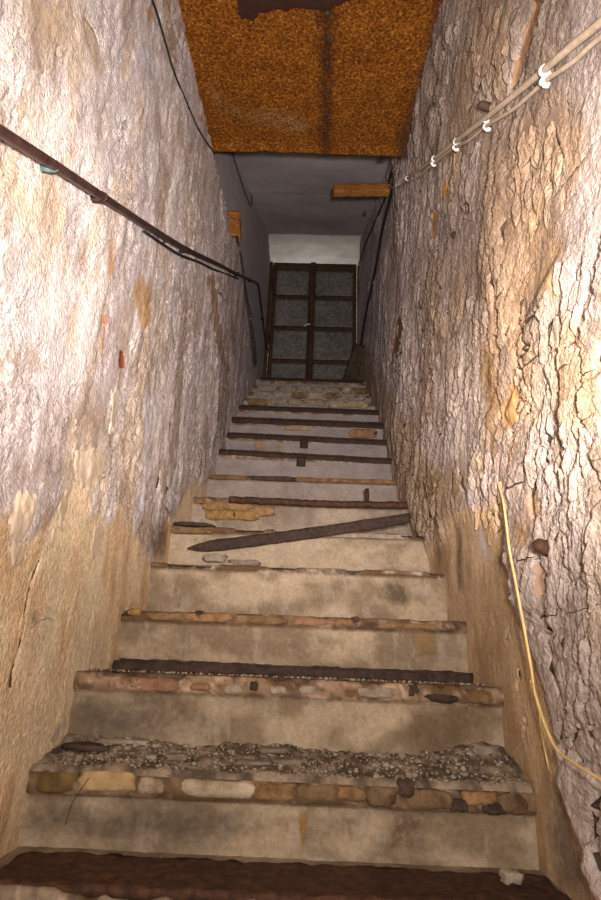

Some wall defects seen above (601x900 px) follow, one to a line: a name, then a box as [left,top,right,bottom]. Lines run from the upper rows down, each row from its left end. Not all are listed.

spalling [501,383,521,429]
peeling [8,490,38,568]
crack [8,558,54,688]